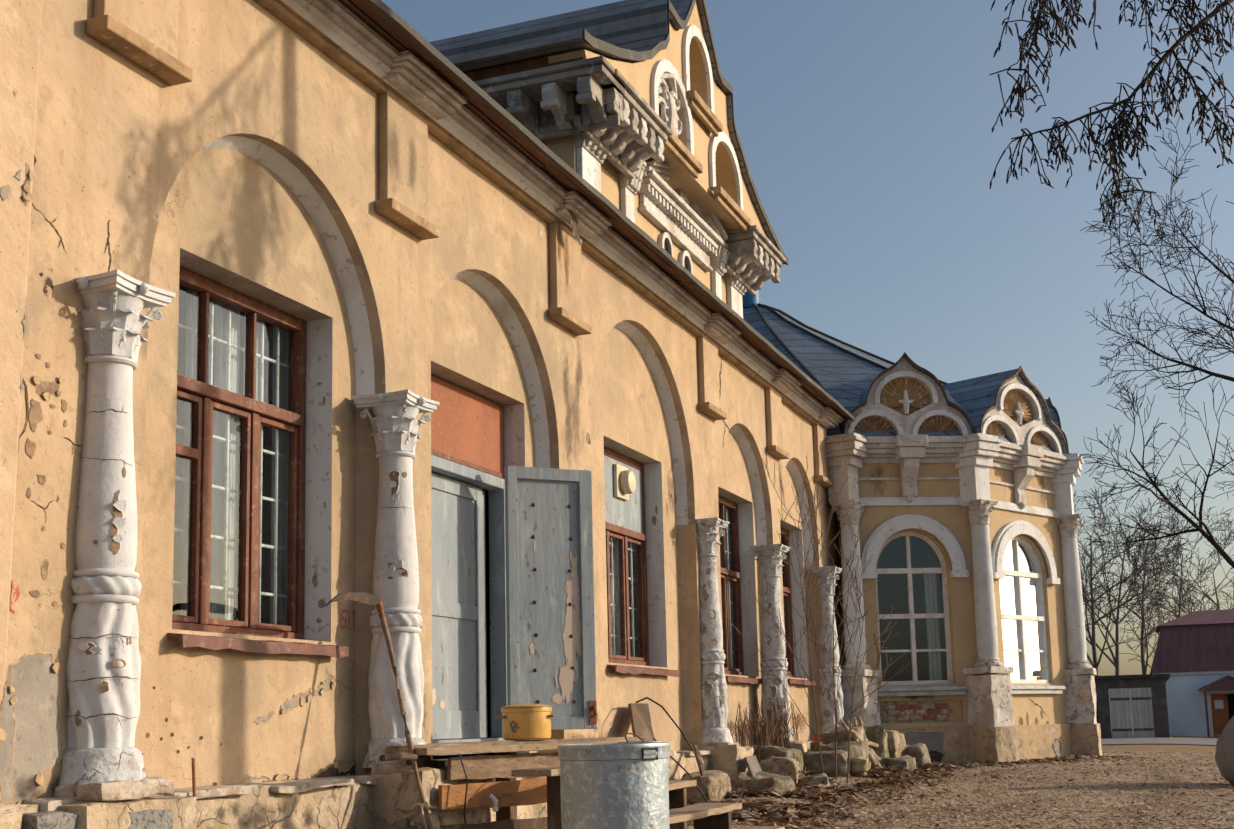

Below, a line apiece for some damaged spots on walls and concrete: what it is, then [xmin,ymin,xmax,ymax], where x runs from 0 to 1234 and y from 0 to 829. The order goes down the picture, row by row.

spalling [0,162,38,207]
crack [31,204,68,254]
crack [104,220,112,270]
crack [18,379,29,452]
peeling [21,353,68,459]
crack [64,437,133,473]
peeling [93,467,127,555]
peeling [389,471,415,503]
crack [70,633,137,647]
crack [65,676,140,728]
flaking render [254,673,336,724]
spalling [0,651,81,805]